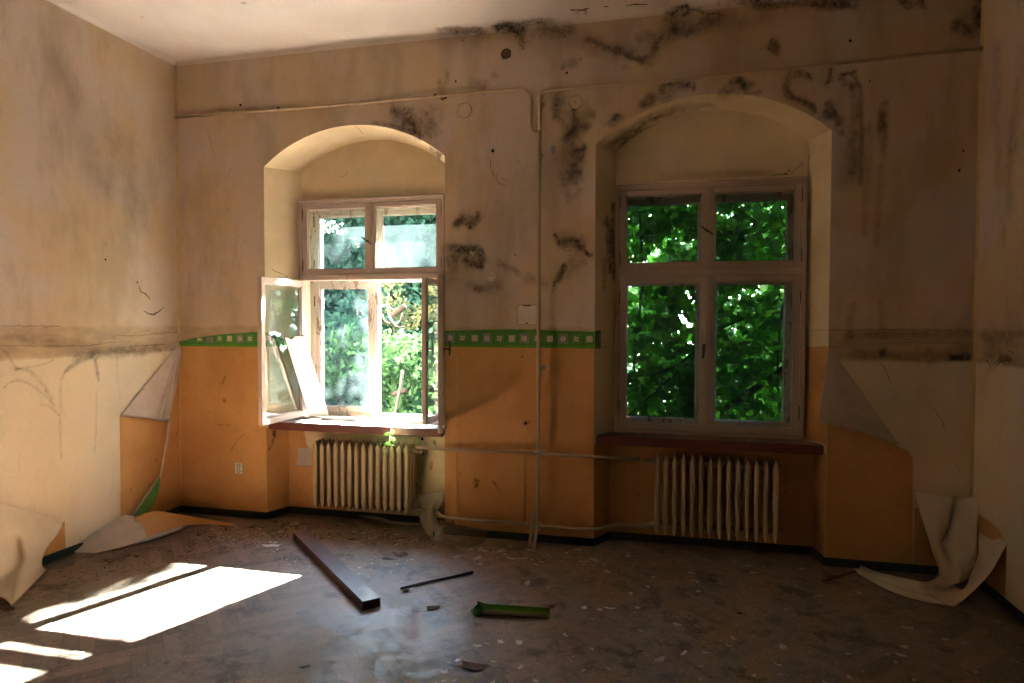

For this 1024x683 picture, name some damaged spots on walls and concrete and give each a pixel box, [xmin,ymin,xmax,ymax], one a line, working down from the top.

peeling [120,345,181,516]
peeling [819,347,899,444]